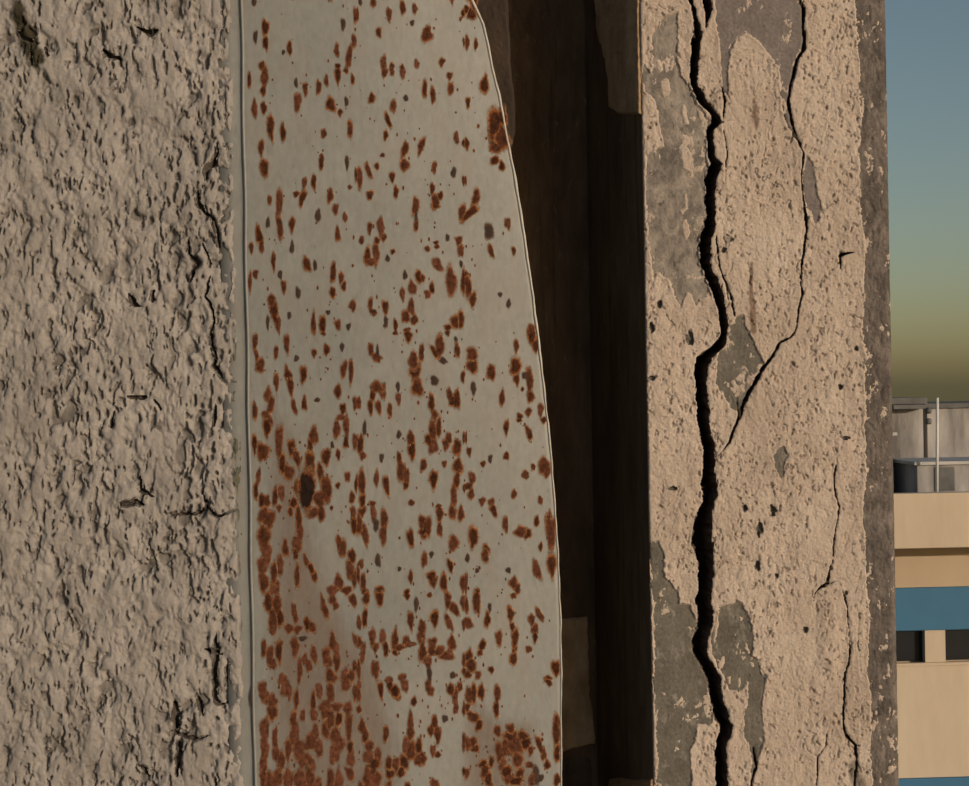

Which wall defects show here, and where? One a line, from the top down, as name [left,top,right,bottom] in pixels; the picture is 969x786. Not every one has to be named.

peeling [594,0,710,308]
peeling [711,0,803,138]
crack [170,490,237,520]
corrosion [248,0,561,786]
peeling [608,542,712,786]
peeling [709,600,765,785]
crack [688,0,809,786]
crack [808,465,860,786]